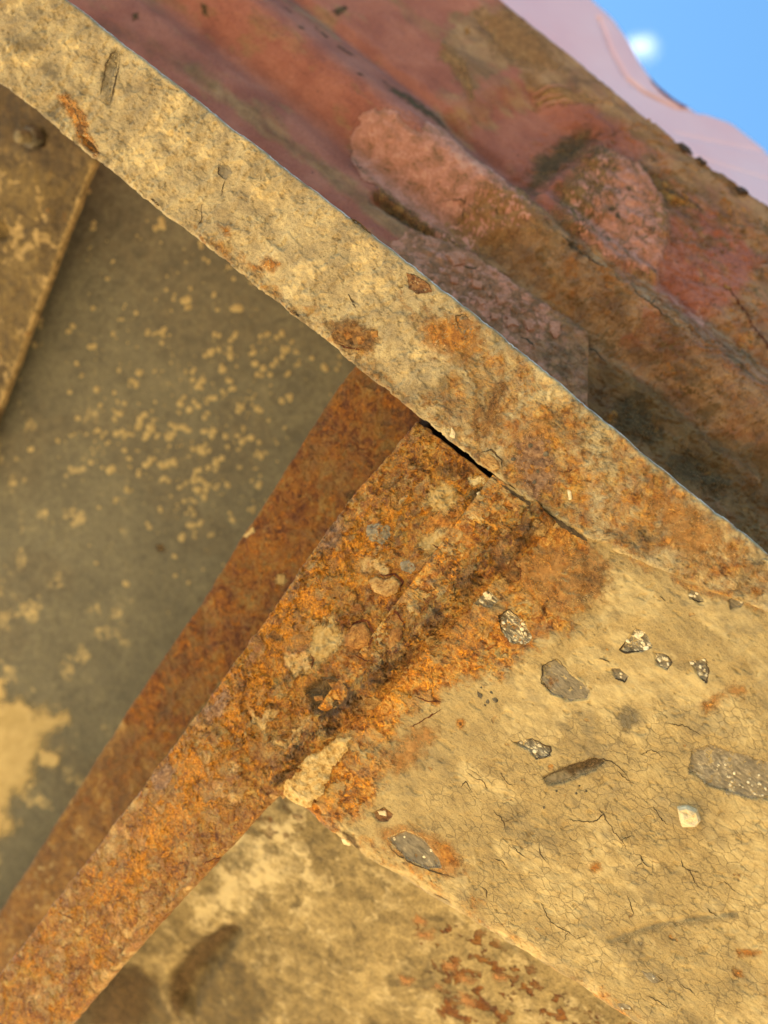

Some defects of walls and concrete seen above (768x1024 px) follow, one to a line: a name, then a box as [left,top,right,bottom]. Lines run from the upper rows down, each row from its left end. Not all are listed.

corrosion [58,95,100,156]
corrosion [331,318,379,350]
corrosion [424,316,480,357]
corrosion [472,383,505,434]
corrosion [428,509,464,548]
crack [500,484,587,541]
corrosion [505,543,609,612]
corrosion [0,366,436,973]